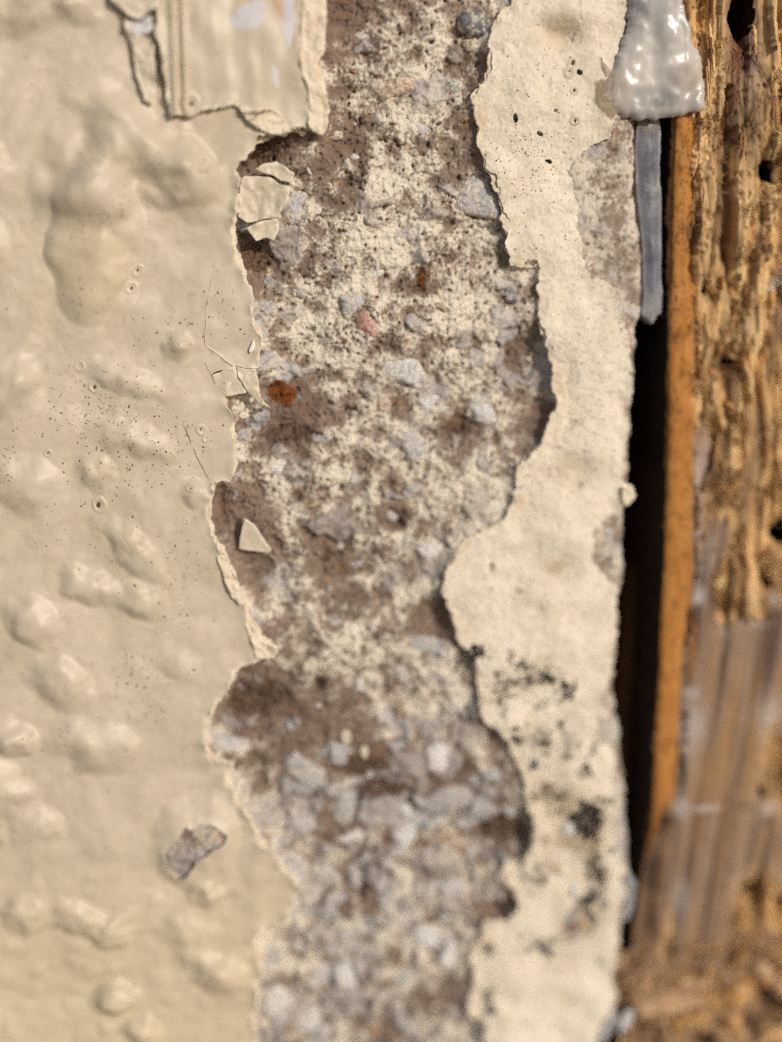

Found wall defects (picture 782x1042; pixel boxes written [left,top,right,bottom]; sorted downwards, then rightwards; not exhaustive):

crack [204,272,257,375]
spalling [112,0,556,1042]
damp [461,640,620,924]
mould [473,932,558,1028]